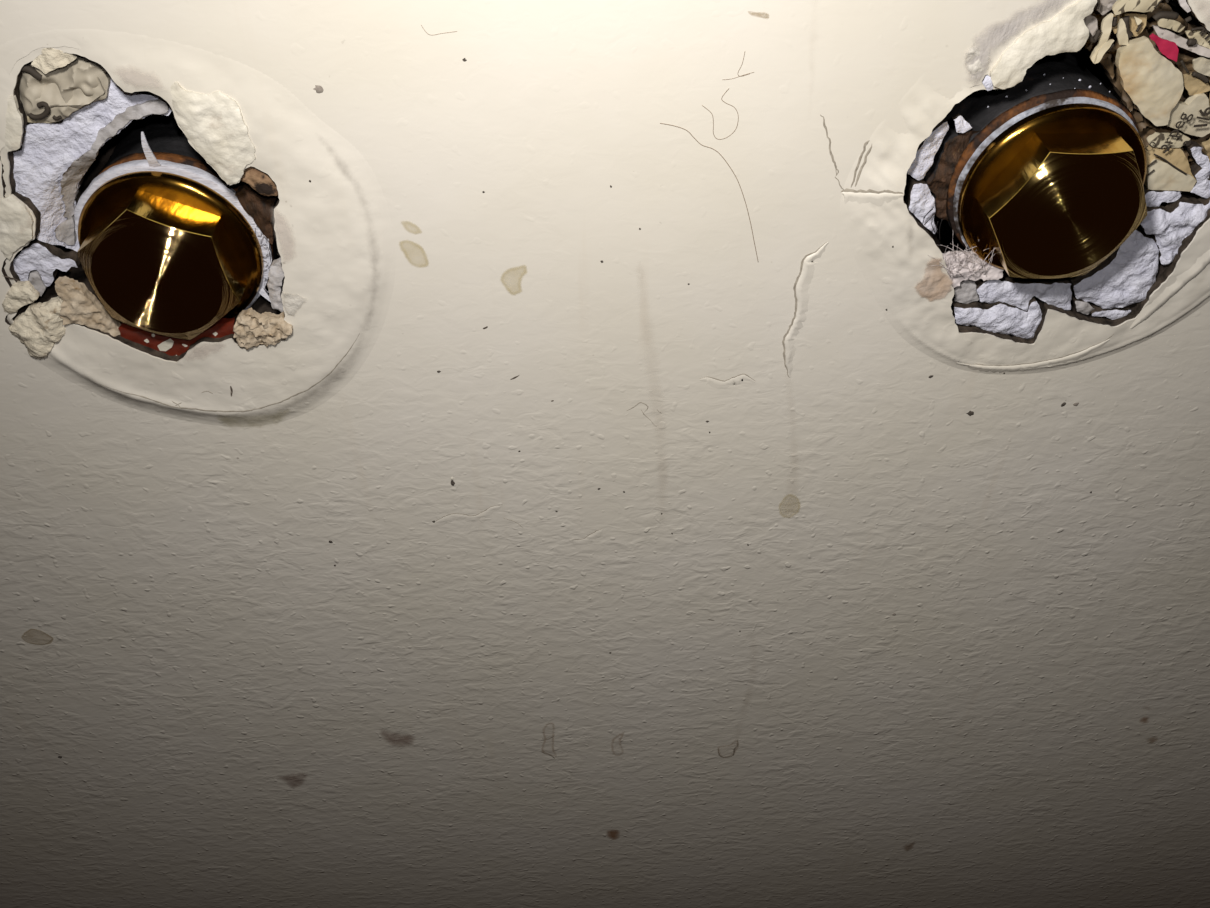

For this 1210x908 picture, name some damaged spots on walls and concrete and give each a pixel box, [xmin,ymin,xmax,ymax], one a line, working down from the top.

peeling [971,0,1063,80]
spalling [1072,46,1123,103]
spalling [1167,0,1209,35]
flaking render [0,75,174,325]
crack [820,114,904,207]
flaking render [903,119,968,254]
flaking render [951,140,1210,339]
peeling [118,276,285,356]
crack [782,242,829,377]
crack [699,374,756,389]